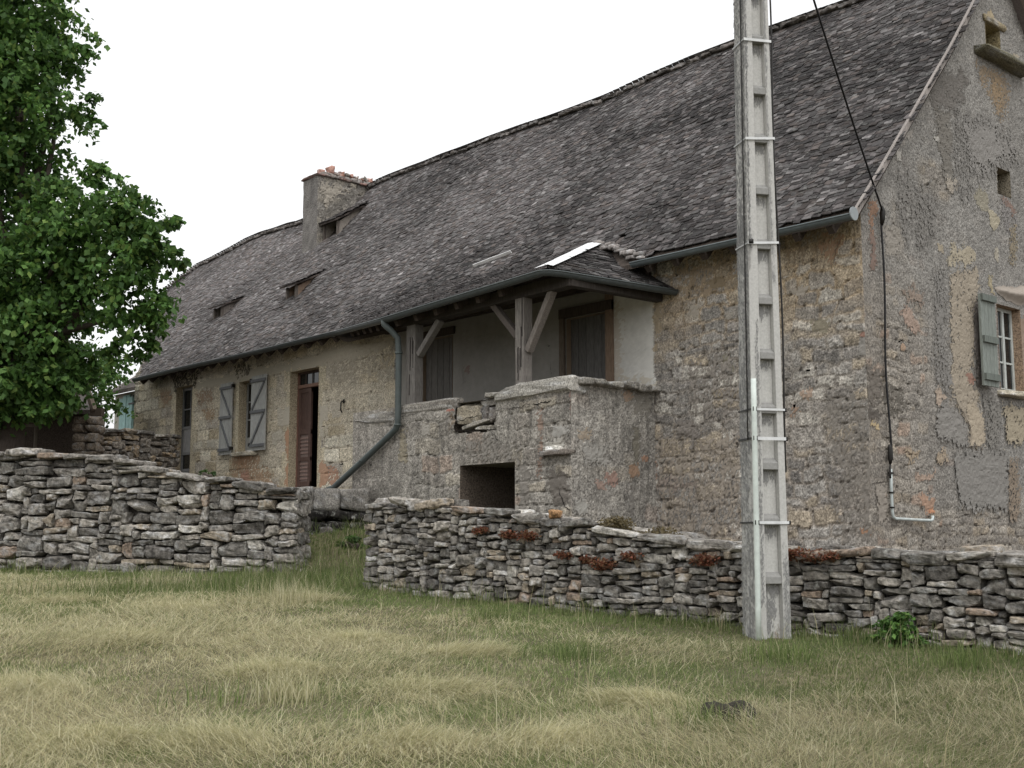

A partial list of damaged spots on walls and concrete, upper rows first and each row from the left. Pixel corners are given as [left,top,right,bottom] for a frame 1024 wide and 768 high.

flaking render [927,65,972,116]
flaking render [935,240,995,450]
flaking render [1001,400,1024,452]